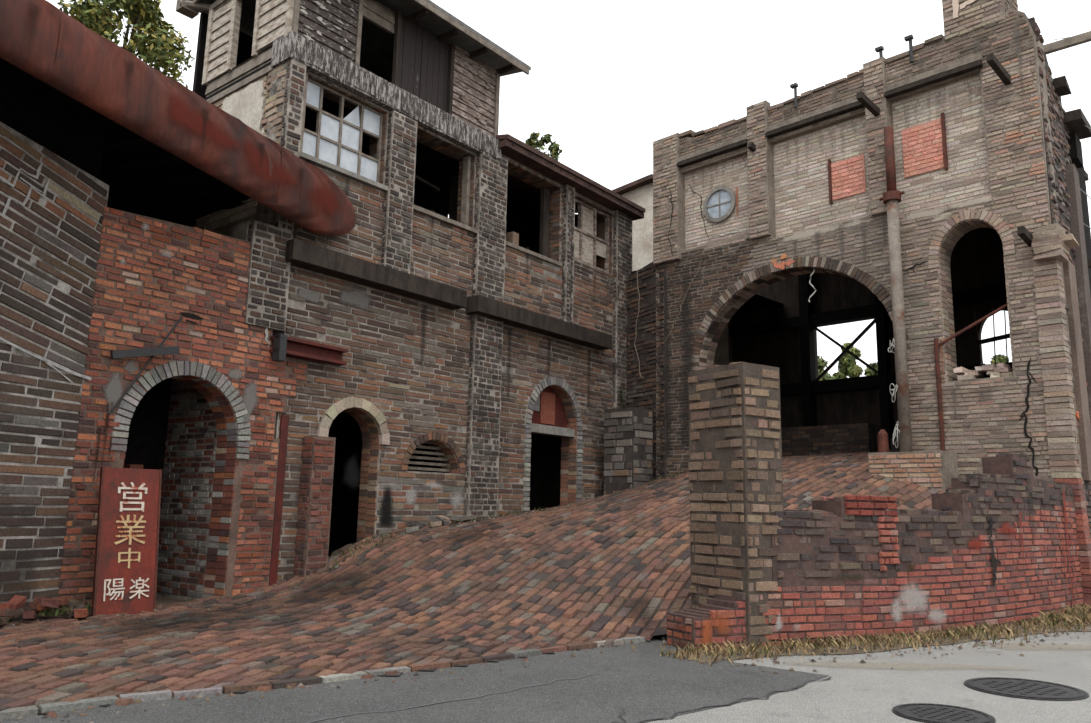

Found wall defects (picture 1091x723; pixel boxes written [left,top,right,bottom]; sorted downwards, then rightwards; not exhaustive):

crack [1019,358,1038,476]
damp [894,590,943,619]